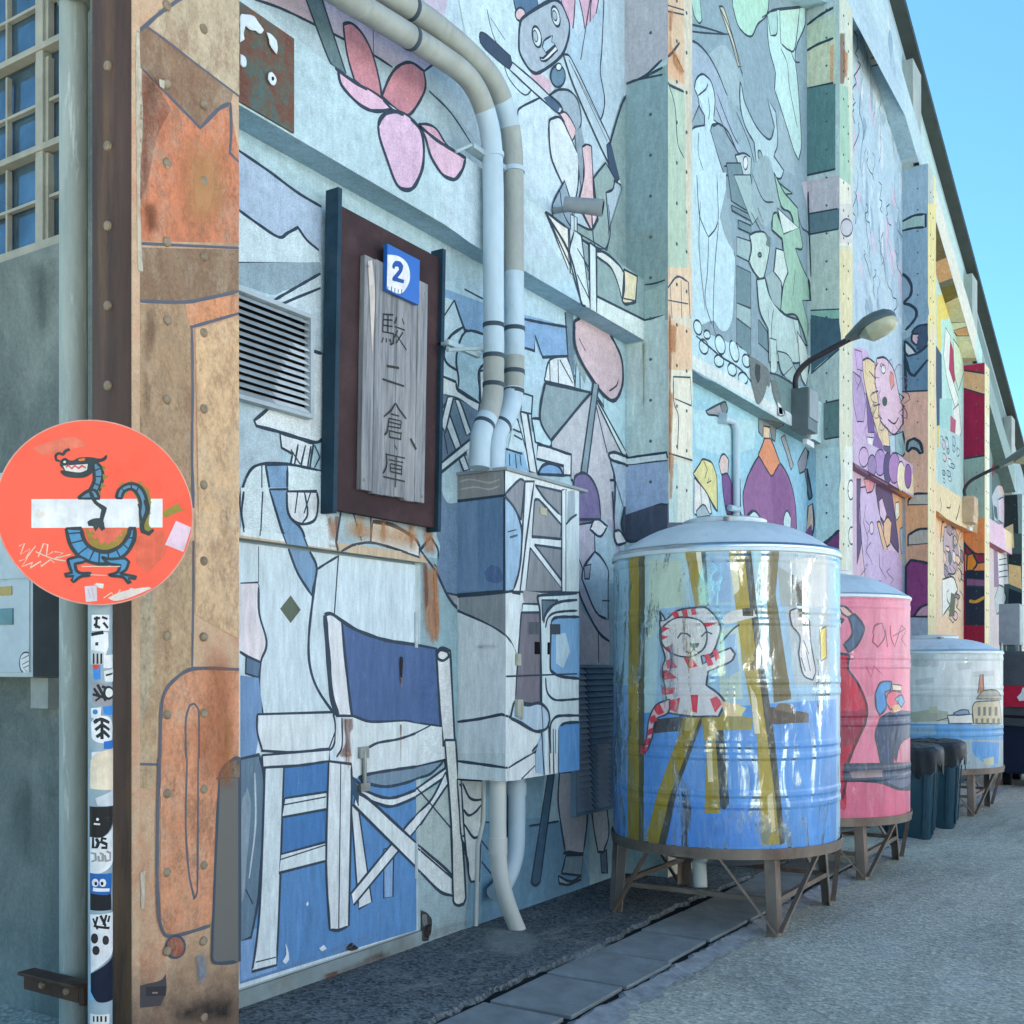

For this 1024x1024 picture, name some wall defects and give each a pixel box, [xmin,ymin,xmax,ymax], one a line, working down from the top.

peeling [240,14,278,67]
corrosion [354,522,434,551]
corrosion [424,564,439,639]